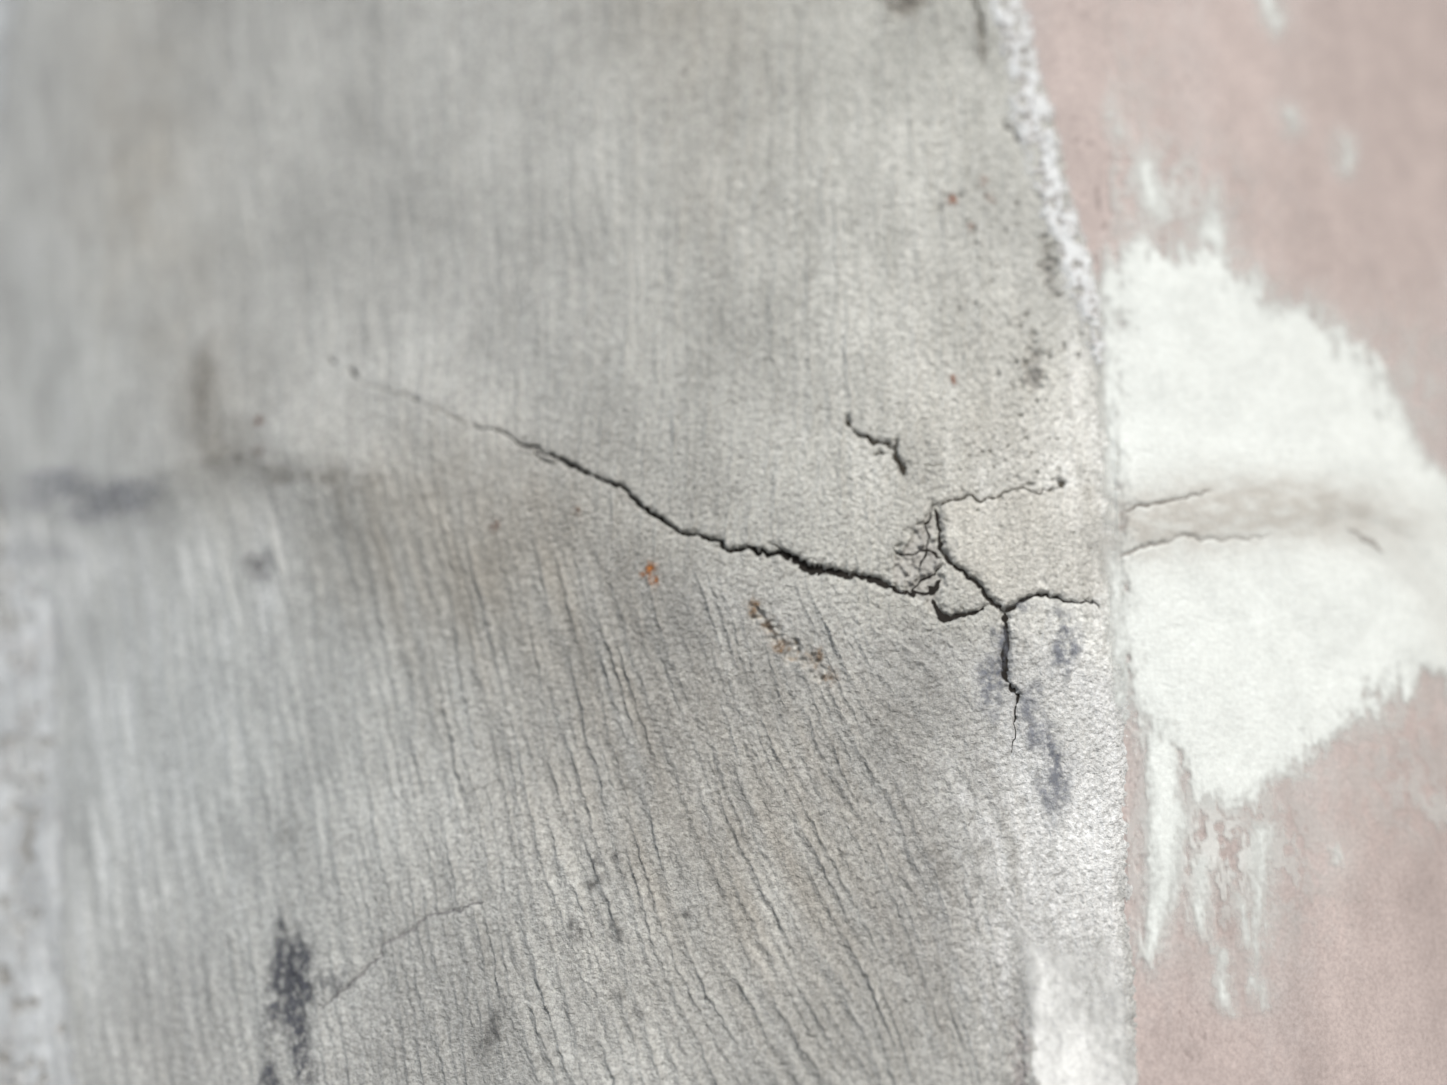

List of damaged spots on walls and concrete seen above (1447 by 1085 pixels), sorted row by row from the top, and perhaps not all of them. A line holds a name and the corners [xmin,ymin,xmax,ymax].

peeling [0,554,74,1085]
crack [330,360,1101,753]